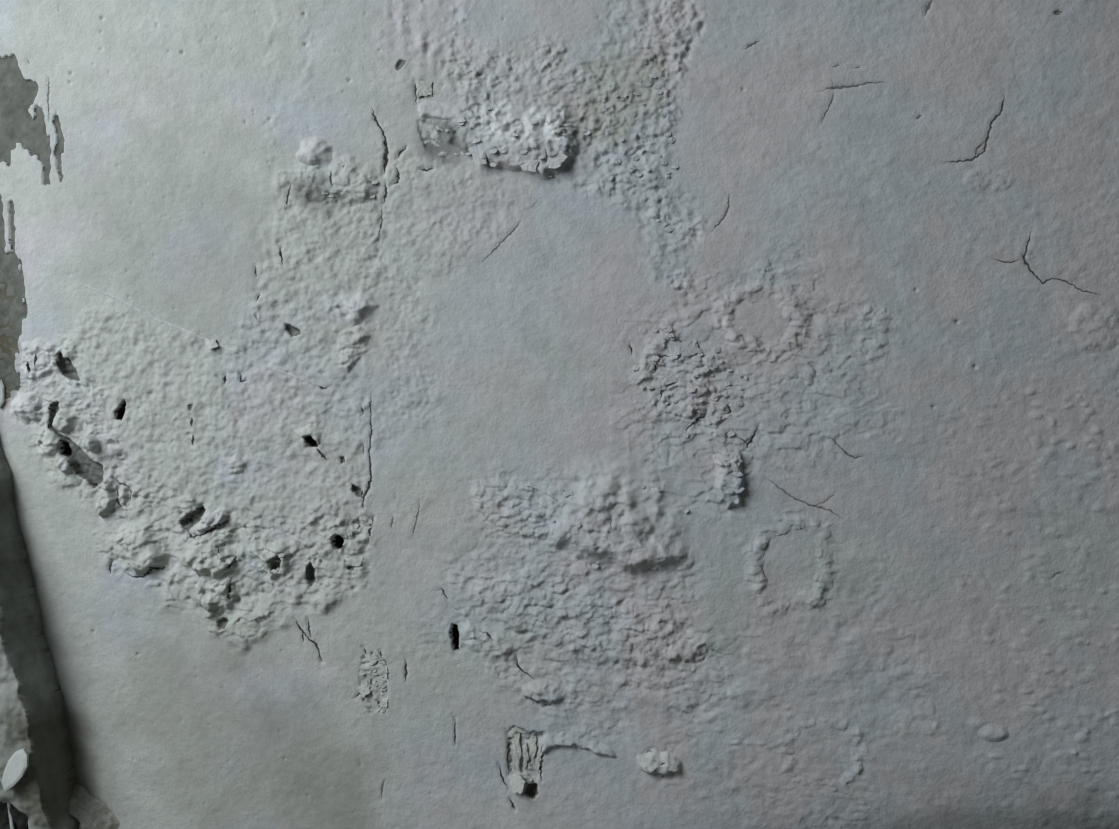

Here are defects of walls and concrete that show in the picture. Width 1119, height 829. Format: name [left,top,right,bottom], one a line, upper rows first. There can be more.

flaking render [0,54,64,185]
crack [821,65,886,123]
crack [944,99,1004,163]
crack [995,232,1095,294]
flaking render [0,195,27,408]
peeling [358,649,389,713]
flaking render [2,748,29,791]
peeling [507,726,545,794]